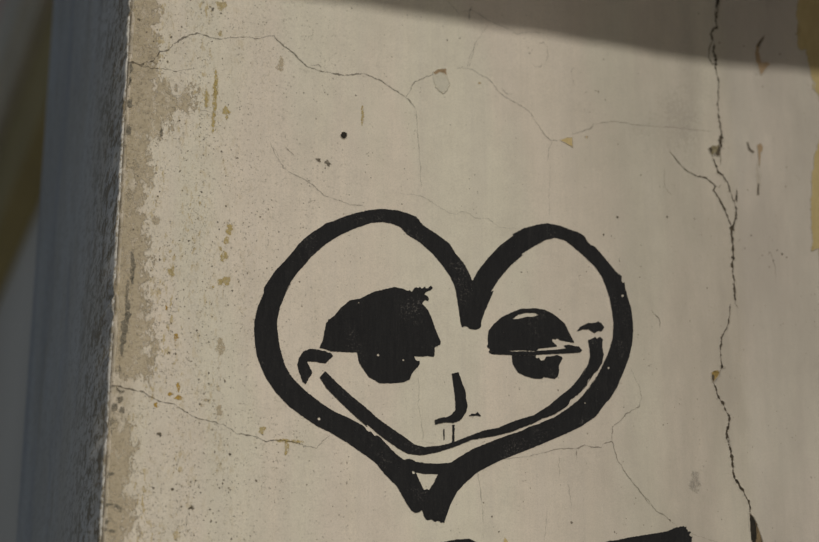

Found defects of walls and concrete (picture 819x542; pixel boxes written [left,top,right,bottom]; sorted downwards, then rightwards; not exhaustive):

crack [130,32,431,178]
peeling [795,0,819,97]
peeling [809,139,819,256]
crack [669,0,764,542]